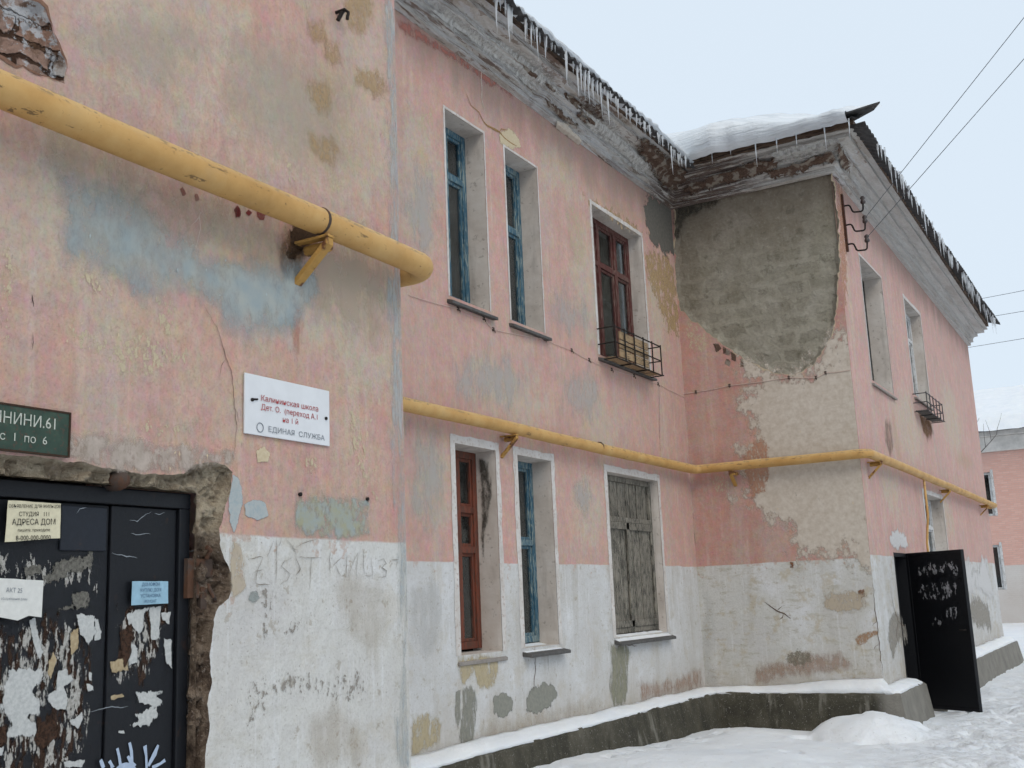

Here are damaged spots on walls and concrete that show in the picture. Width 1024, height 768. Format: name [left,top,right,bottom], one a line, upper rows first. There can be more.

flaking render [0,0,68,83]
crack [467,96,516,146]
peeling [428,0,871,575]
crack [212,320,239,454]
peeling [296,496,369,539]
flaking render [0,435,270,768]
peeling [460,657,498,689]